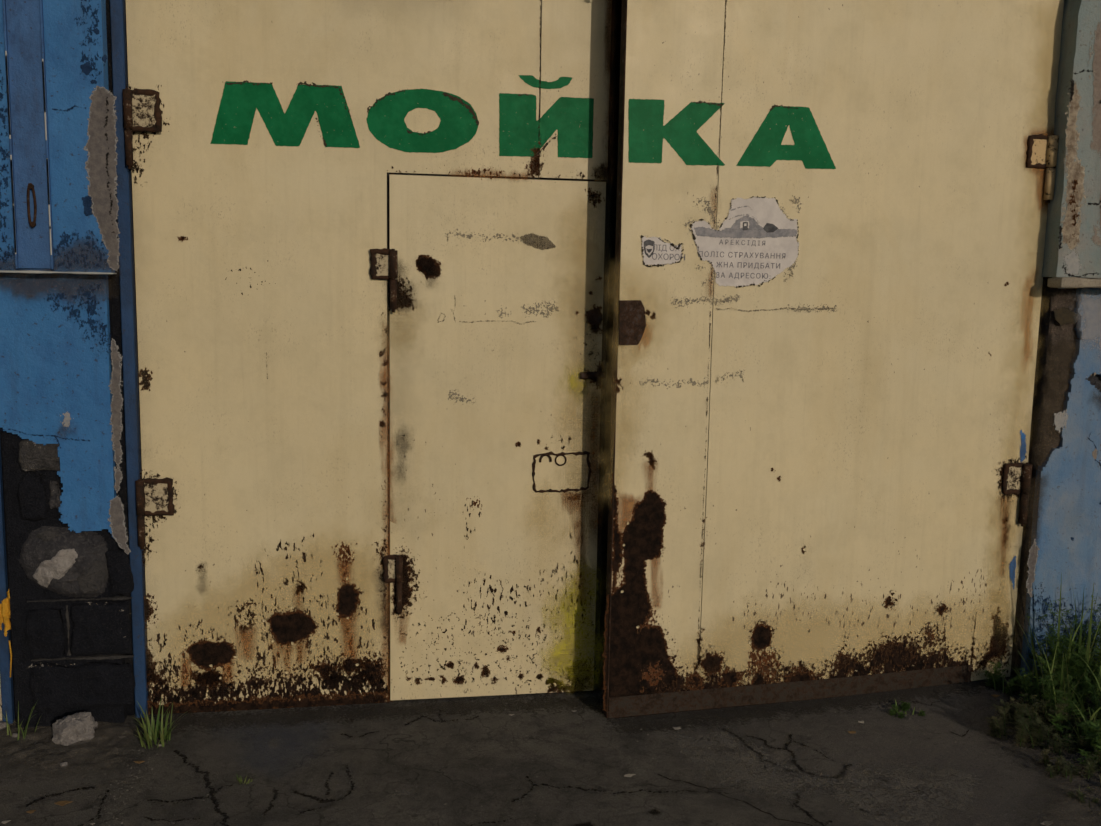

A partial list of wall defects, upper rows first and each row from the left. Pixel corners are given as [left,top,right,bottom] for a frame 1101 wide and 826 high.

peeling [80,62,120,272]
spalling [1032,21,1101,485]
corrosion [379,326,406,474]
spalling [17,338,136,713]
leakage [549,563,603,684]
corrosion [142,465,1013,718]
corrosion [996,453,1027,563]
peeling [1026,539,1040,597]
crack [18,785,111,826]
crack [142,747,357,826]
crack [470,728,925,826]